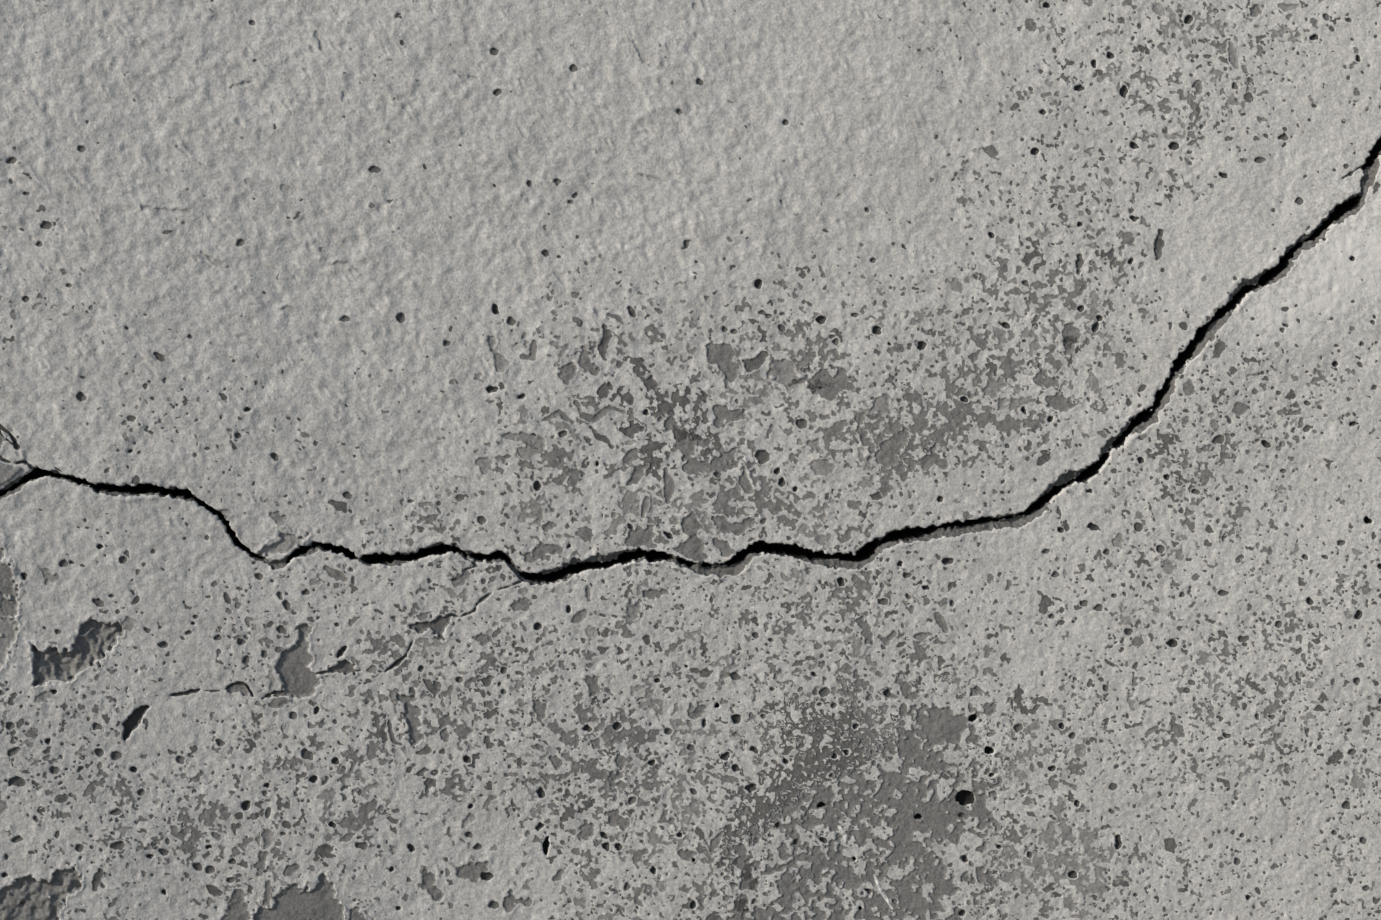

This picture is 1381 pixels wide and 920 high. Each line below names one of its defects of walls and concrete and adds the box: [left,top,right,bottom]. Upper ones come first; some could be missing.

crack [0,137,1381,675]
crack [170,681,285,700]